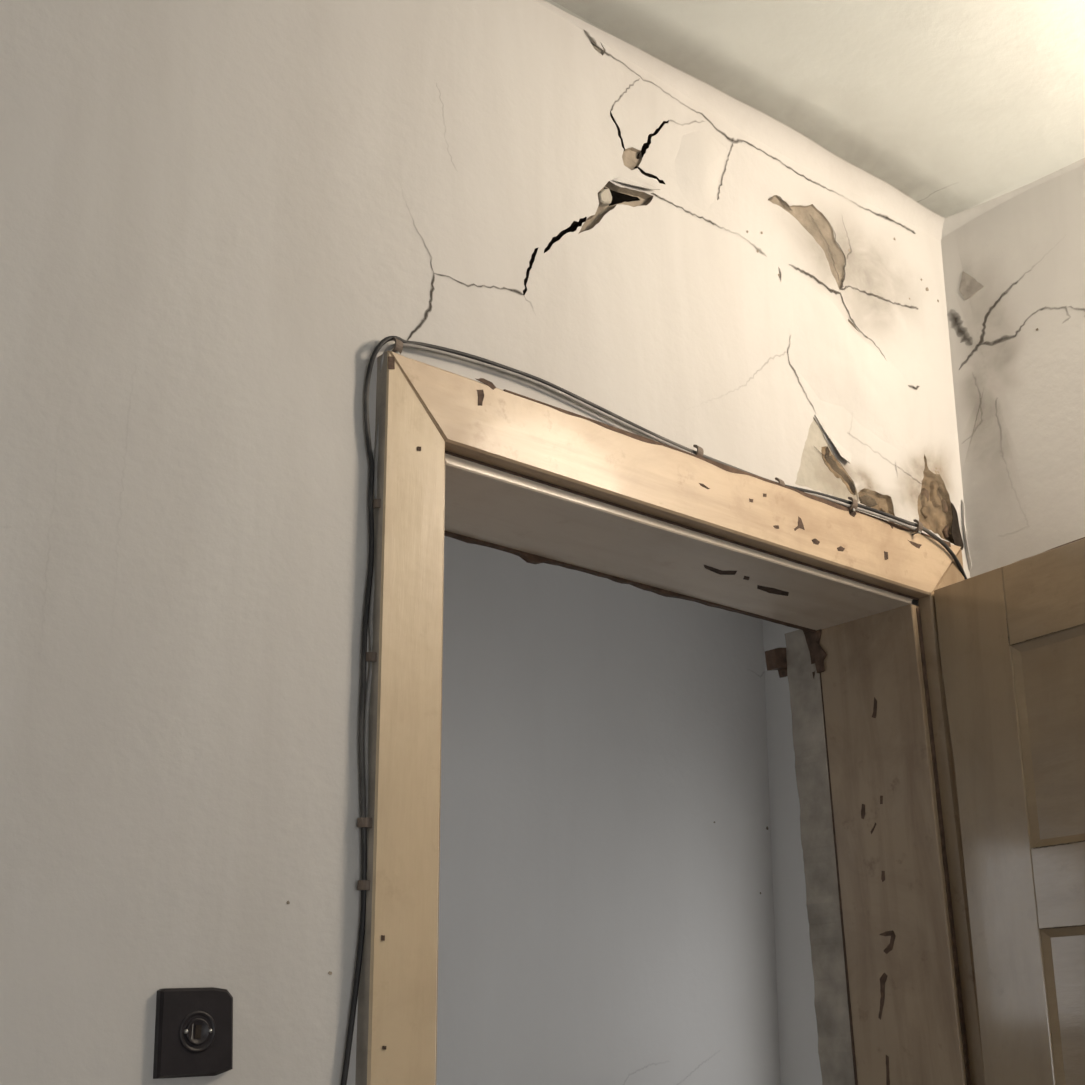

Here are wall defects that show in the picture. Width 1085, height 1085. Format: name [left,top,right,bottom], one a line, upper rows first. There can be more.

crack [584,30,832,225]
crack [407,217,587,341]
spalling [579,175,660,233]
flaking render [768,195,850,289]
crack [779,266,918,356]
crack [862,207,916,234]
crack [960,282,1085,368]
flaking render [476,378,972,572]